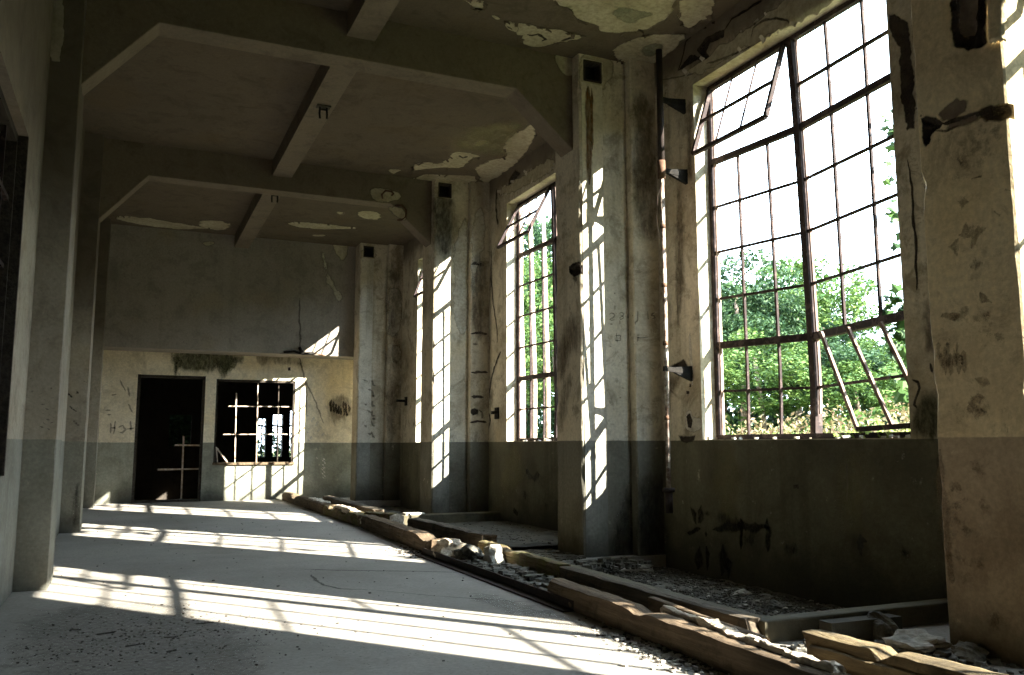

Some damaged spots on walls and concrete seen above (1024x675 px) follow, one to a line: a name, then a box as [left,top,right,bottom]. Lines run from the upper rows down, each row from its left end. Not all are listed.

peeling [463,0,833,90]
crack [889,14,916,130]
spalling [950,0,987,50]
peeling [114,215,230,230]
peeling [287,188,407,260]
peeling [388,125,555,334]
crack [907,159,918,290]
leakage [171,353,243,377]
crack [288,300,324,423]
crack [912,363,933,407]